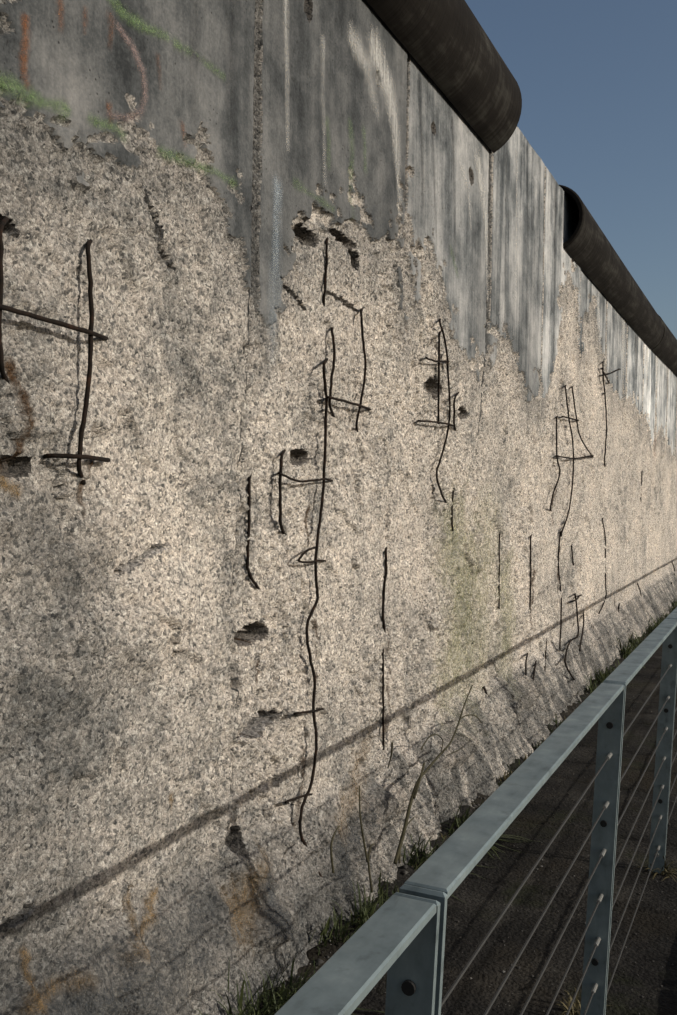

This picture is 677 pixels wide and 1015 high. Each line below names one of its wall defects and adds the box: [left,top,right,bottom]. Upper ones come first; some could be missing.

damp [352,36,397,157]
damp [477,157,487,235]
rust [5,361,34,457]
spalling [0,90,286,1015]
spalling [230,165,677,980]